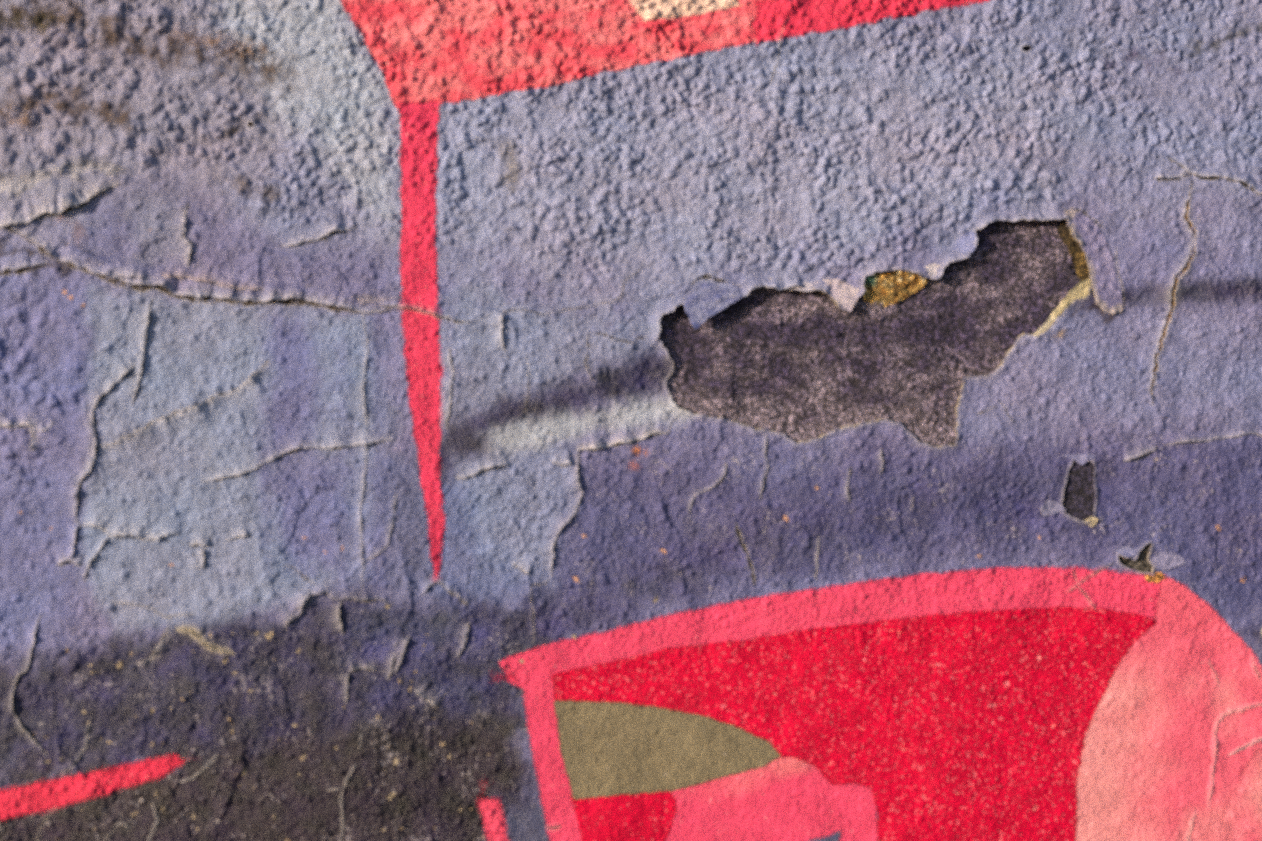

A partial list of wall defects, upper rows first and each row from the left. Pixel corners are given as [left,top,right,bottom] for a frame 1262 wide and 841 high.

peeling [643,204,1123,457]
crack [1070,155,1262,463]
crack [0,168,681,709]
peeling [1039,454,1101,528]
crack [1065,561,1115,611]
crack [2,614,91,841]
crack [102,802,160,841]
crack [179,753,219,783]
crack [326,734,363,841]
crack [545,821,562,833]
crack [1184,655,1262,841]